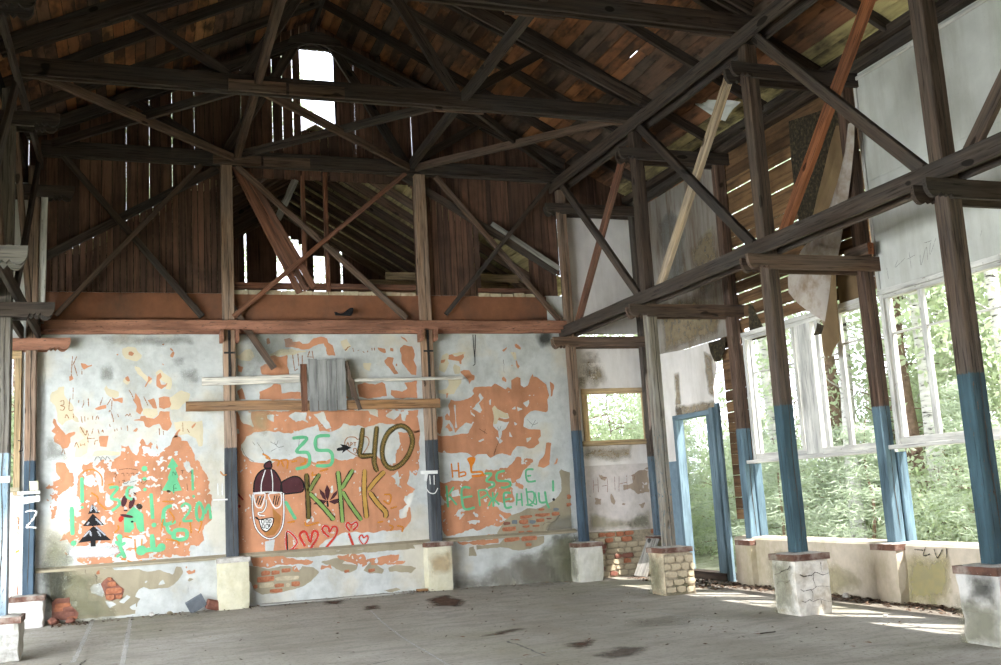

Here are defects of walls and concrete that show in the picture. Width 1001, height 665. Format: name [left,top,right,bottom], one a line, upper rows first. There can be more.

peeling [46,344,212,620]
peeling [236,337,420,595]
peeling [437,344,572,556]
flaking render [589,529,654,578]